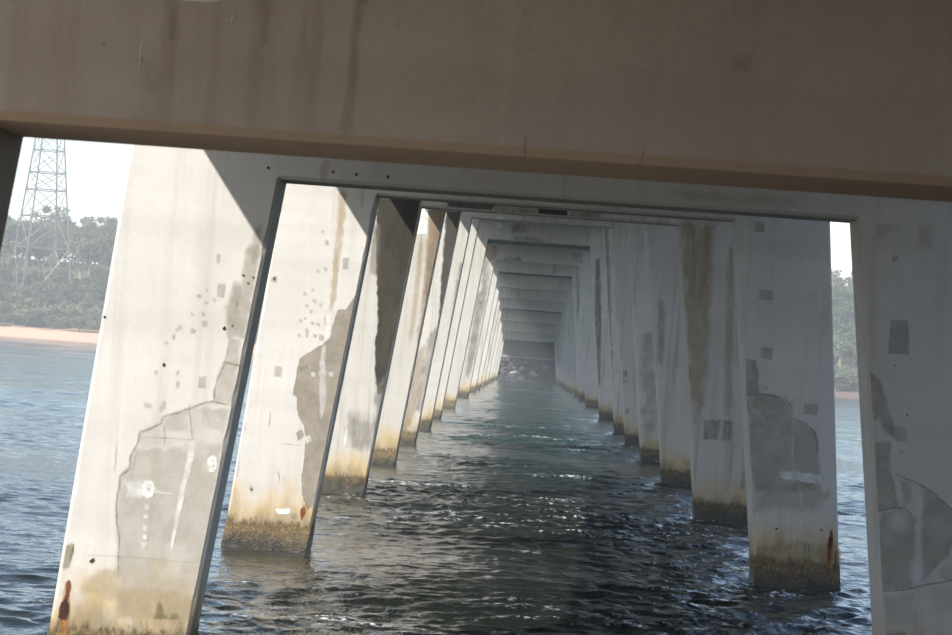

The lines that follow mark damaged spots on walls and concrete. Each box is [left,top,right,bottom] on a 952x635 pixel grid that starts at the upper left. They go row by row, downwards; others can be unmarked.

peeling [293,296,355,508]
rust [827,530,841,571]
rust [58,580,71,620]